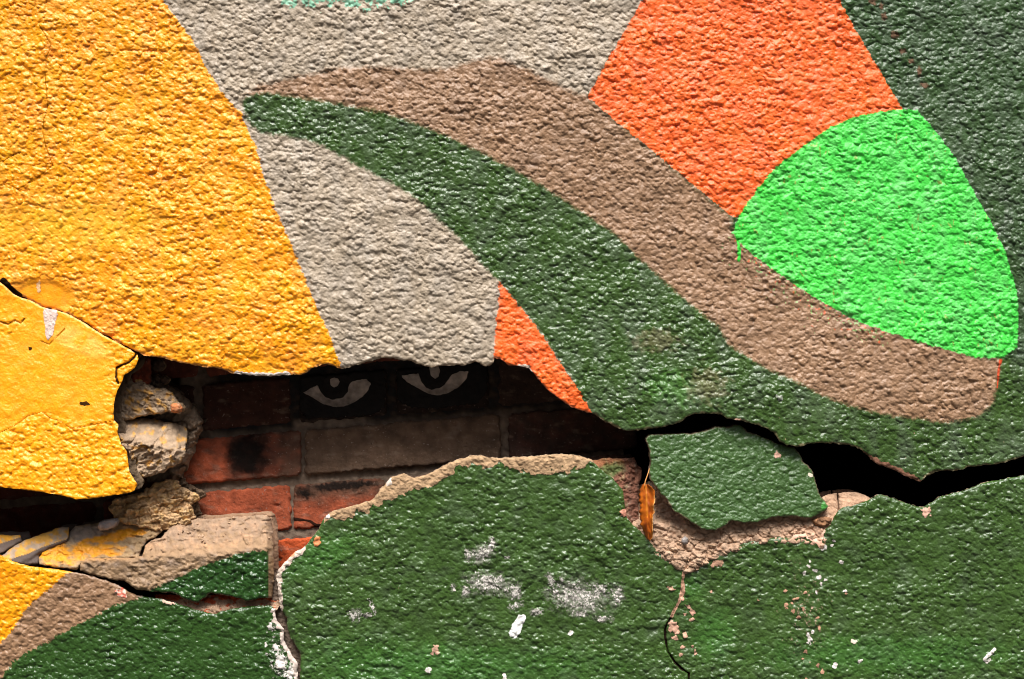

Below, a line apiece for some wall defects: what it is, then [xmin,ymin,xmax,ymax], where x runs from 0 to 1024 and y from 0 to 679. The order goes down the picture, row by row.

crack [0,277,137,384]
spalling [131,357,158,384]
spalling [324,454,836,574]
spalling [154,536,321,614]
damp [452,537,542,615]
damp [547,575,622,622]
crack [664,572,690,679]
peeling [783,560,827,660]